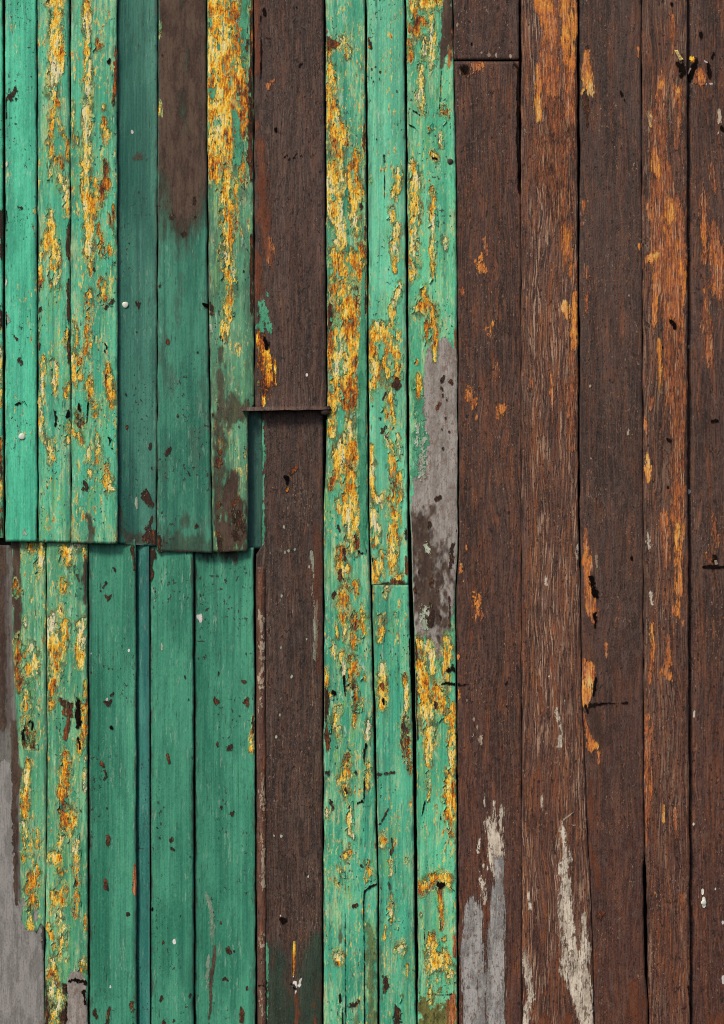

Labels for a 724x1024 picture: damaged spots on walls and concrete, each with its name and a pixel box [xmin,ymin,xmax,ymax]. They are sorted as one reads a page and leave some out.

peeling [38,0,116,478]
peeling [202,0,254,344]
peeling [324,0,458,843]
peeling [11,529,87,740]
peeling [0,696,88,1024]
peeling [332,947,346,967]
peeling [363,859,375,884]
peeling [378,830,395,878]
peeling [382,891,408,958]
peeling [418,797,507,1024]
peeling [522,949,536,1024]
peeling [556,821,594,1024]